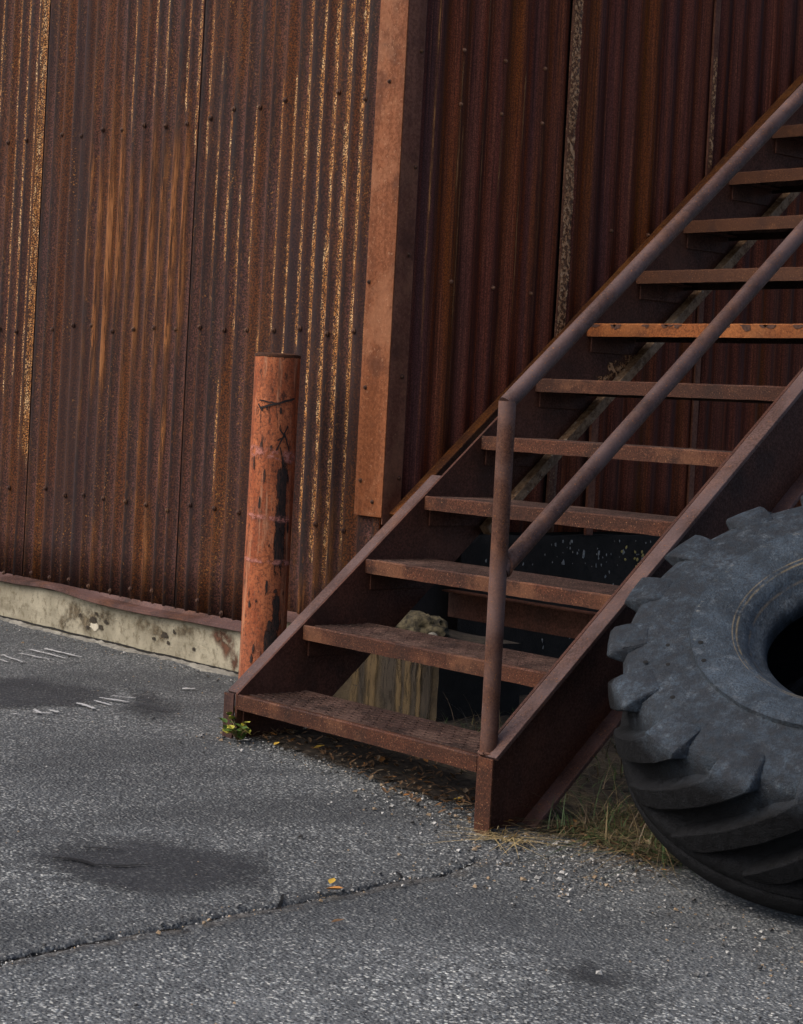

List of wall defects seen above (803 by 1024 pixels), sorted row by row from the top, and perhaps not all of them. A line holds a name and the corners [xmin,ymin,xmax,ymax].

rust [3,0,50,455]
rust [85,2,258,384]
rust [256,0,371,584]
crack [0,917,218,966]
water stain [48,841,261,890]
crack [271,894,317,910]